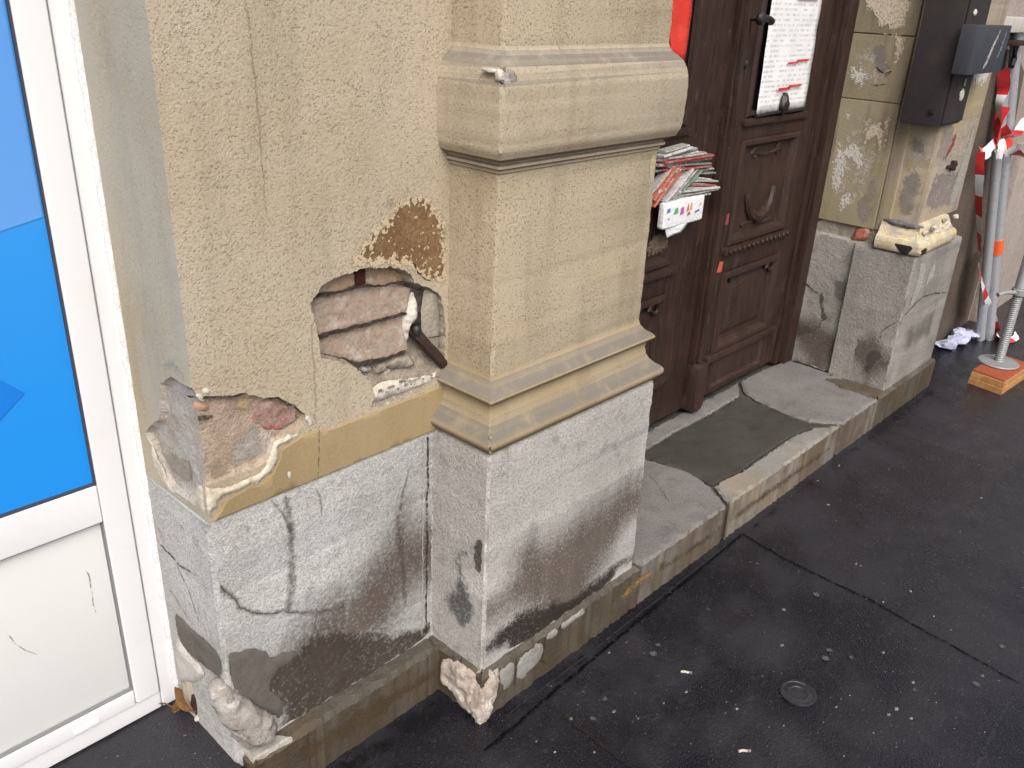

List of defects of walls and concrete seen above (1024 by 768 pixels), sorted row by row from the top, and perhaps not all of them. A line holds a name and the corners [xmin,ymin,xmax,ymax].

spalling [310,187,448,408]
spalling [145,376,312,515]
crack [221,586,299,614]
water stain [269,480,432,725]
crack [421,436,429,634]
water stain [447,553,472,626]
spalling [440,608,585,725]
water stain [486,485,641,654]